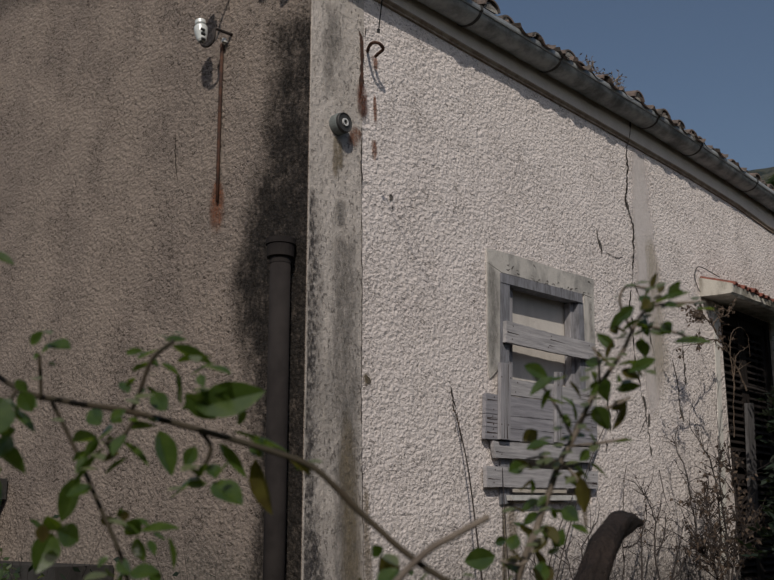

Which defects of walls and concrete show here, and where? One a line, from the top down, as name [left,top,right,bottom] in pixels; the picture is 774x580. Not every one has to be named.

rust [358,27,377,121]
damp [235,17,323,580]
crack [597,122,687,455]